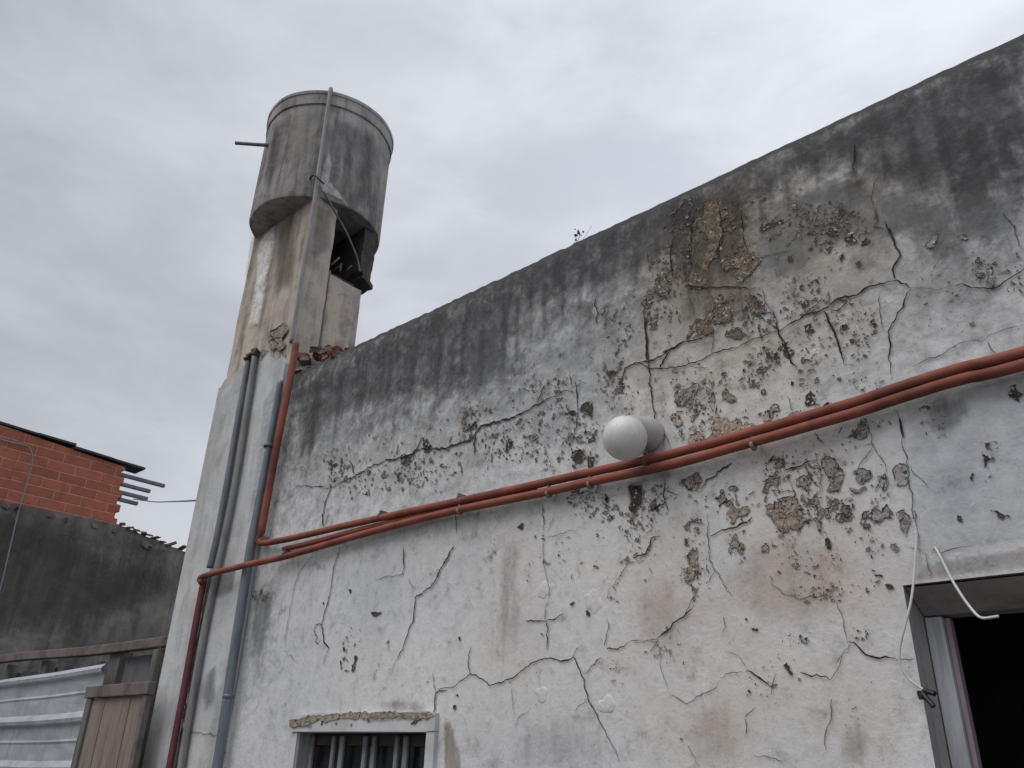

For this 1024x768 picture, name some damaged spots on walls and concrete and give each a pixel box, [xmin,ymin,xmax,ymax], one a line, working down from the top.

leakage [320,154,341,198]
spalling [260,322,350,371]
peeling [320,185,884,500]
crack [619,144,1024,445]
crack [300,375,585,525]
peeling [566,417,911,604]
crack [856,413,971,576]
peeling [970,441,999,482]
peeling [340,627,360,672]
flaking render [289,711,435,727]
crack [377,516,457,671]
crack [432,463,915,763]